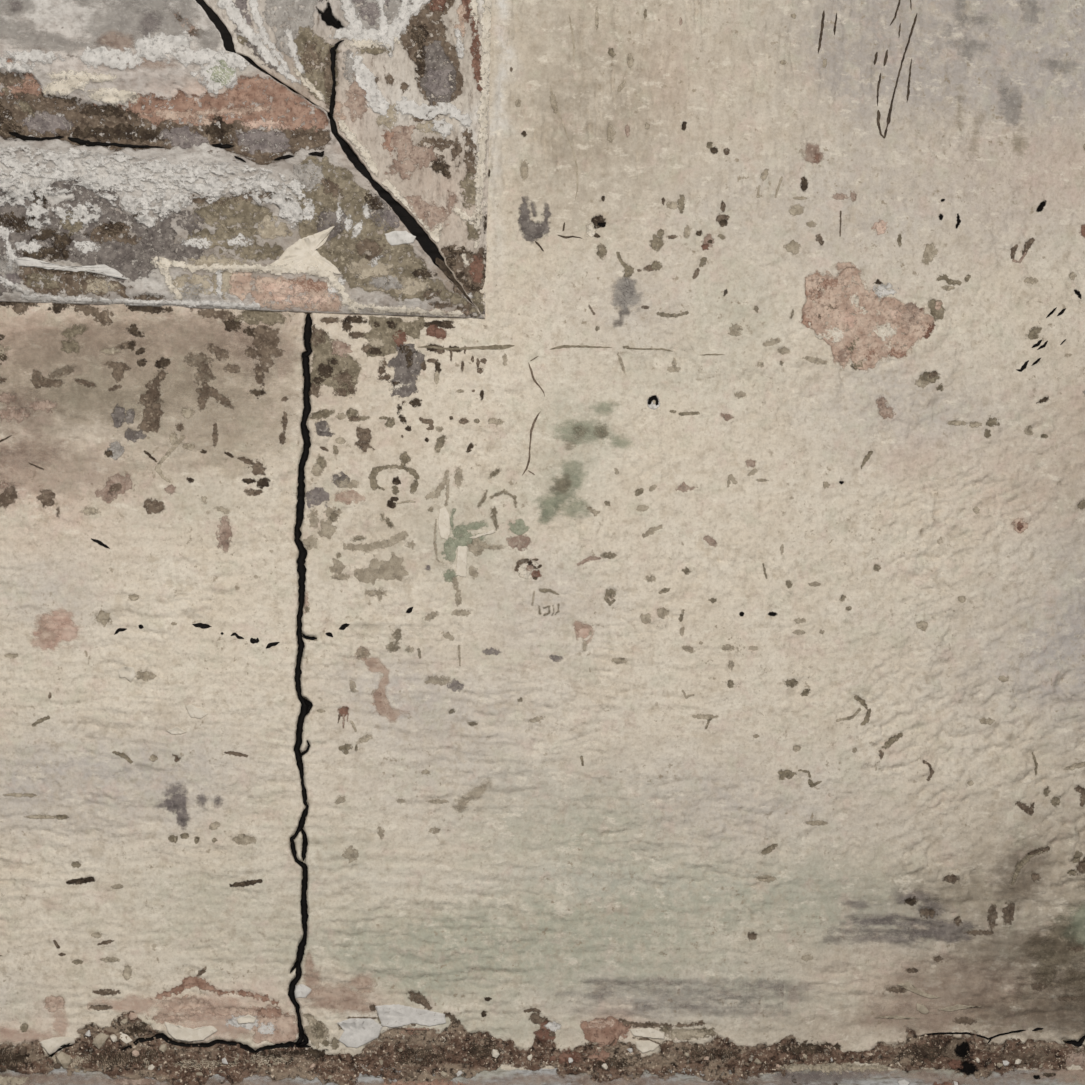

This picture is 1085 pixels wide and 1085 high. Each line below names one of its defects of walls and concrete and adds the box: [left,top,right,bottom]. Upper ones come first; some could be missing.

crack [9,132,161,148]
crack [196,0,473,304]
peeling [0,0,559,616]
spalling [642,306,689,318]
flaking render [790,262,971,370]
crack [114,624,144,635]
crack [121,313,350,1053]
damp [859,891,968,942]
spalling [954,902,1015,936]
damp [1027,906,1085,991]
spalling [0,967,1085,1085]
crack [920,1027,1085,1047]